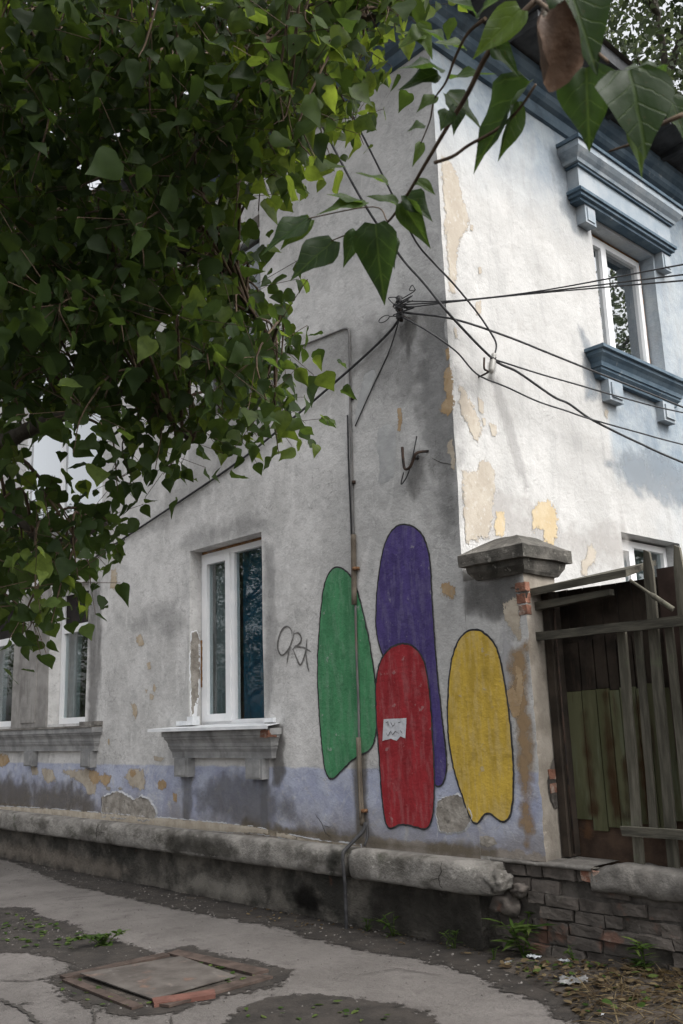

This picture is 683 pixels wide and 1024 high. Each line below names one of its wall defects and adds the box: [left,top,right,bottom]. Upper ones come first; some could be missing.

peeling [440,156,473,294]
peeling [440,327,497,440]
peeling [447,438,505,544]
peeling [532,499,559,545]
flaking render [189,630,201,716]
peeling [0,766,362,848]
flaking render [435,792,472,835]